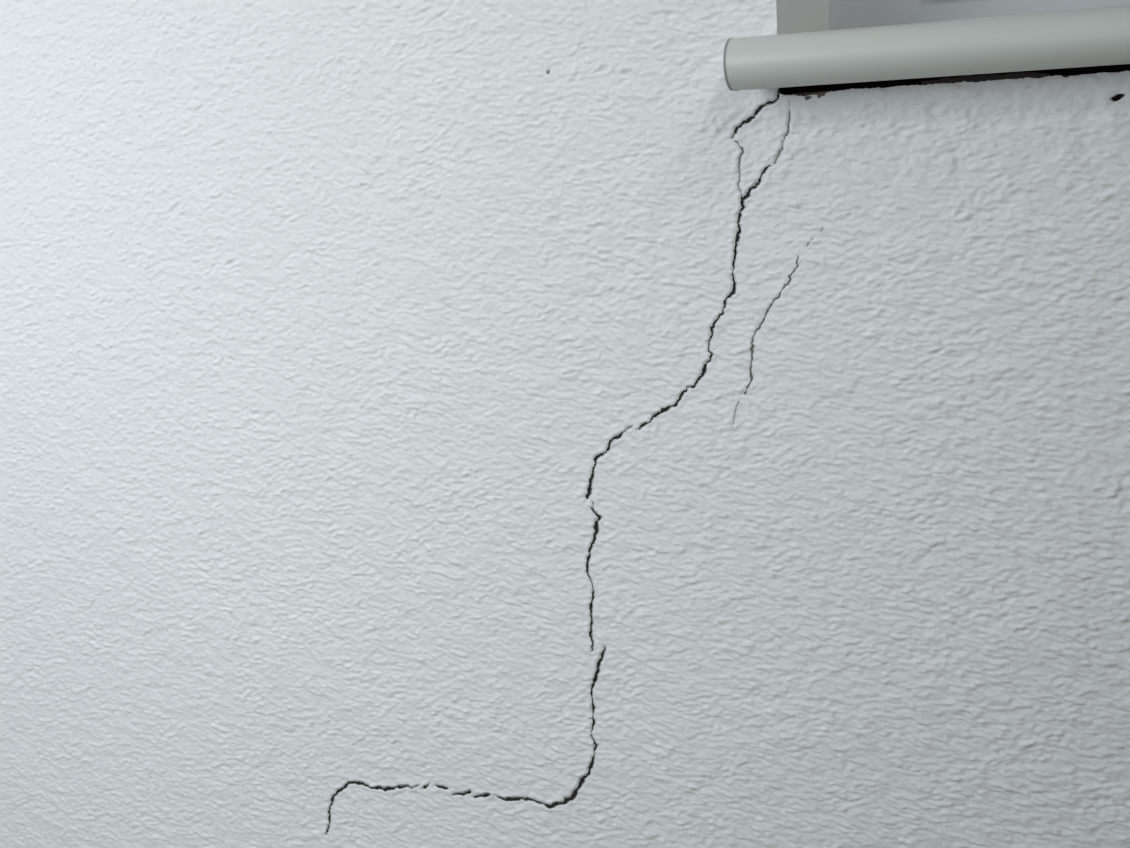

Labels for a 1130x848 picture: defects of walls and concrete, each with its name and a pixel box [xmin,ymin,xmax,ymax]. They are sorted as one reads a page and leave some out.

crack [326,88,790,835]
crack [733,229,823,420]